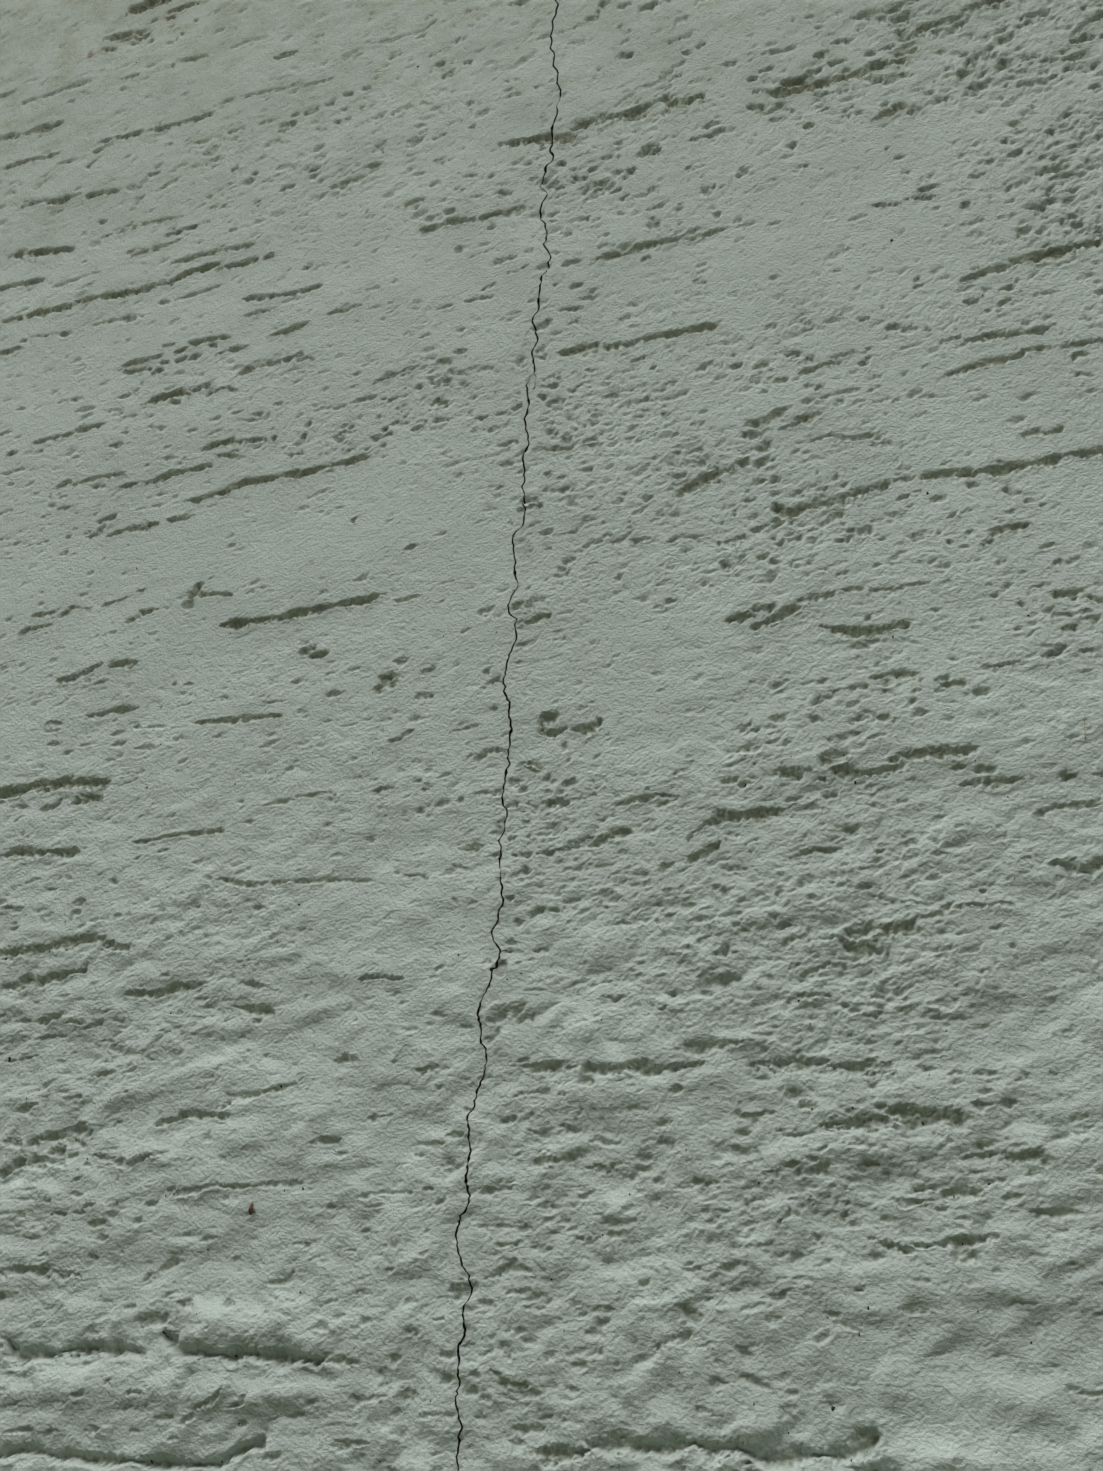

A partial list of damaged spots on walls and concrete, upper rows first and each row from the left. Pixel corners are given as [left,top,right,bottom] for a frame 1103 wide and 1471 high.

crack [455,0,561,1471]